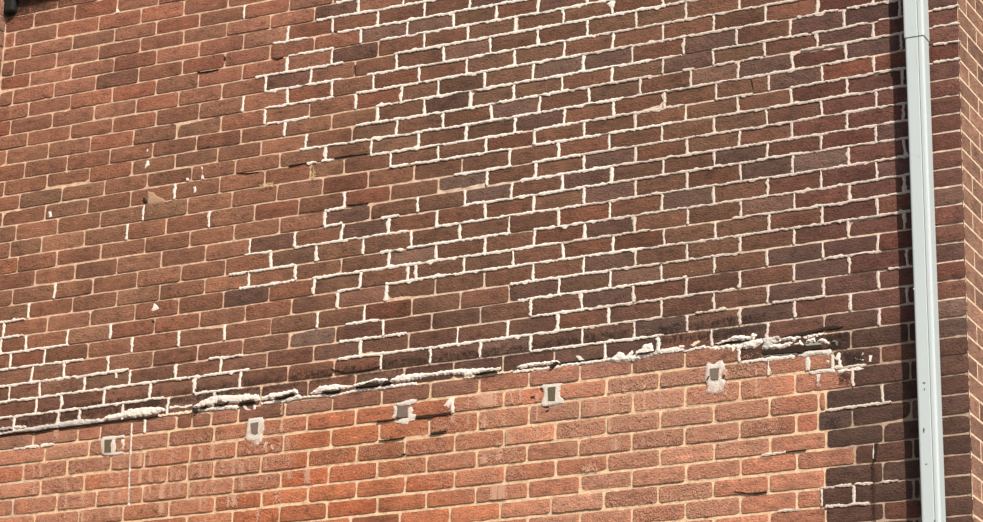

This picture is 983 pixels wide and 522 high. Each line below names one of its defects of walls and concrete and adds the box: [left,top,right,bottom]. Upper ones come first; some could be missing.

crack [782,326,843,346]
crack [549,357,603,369]
crack [322,366,392,393]
crack [192,393,294,413]
crack [0,416,158,436]